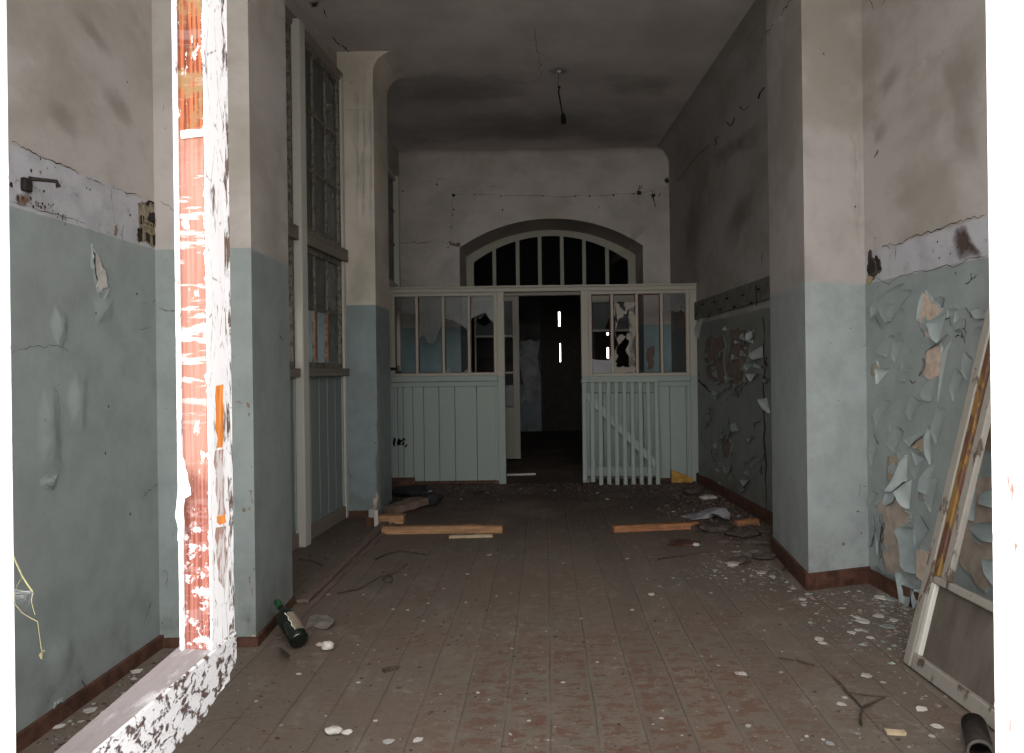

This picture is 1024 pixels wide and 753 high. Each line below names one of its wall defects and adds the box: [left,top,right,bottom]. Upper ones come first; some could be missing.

spalling [9,182,66,225]
spalling [114,200,156,248]
spalling [866,238,882,284]
peeling [694,318,768,398]
peeling [749,398,770,479]
peeling [868,283,986,609]